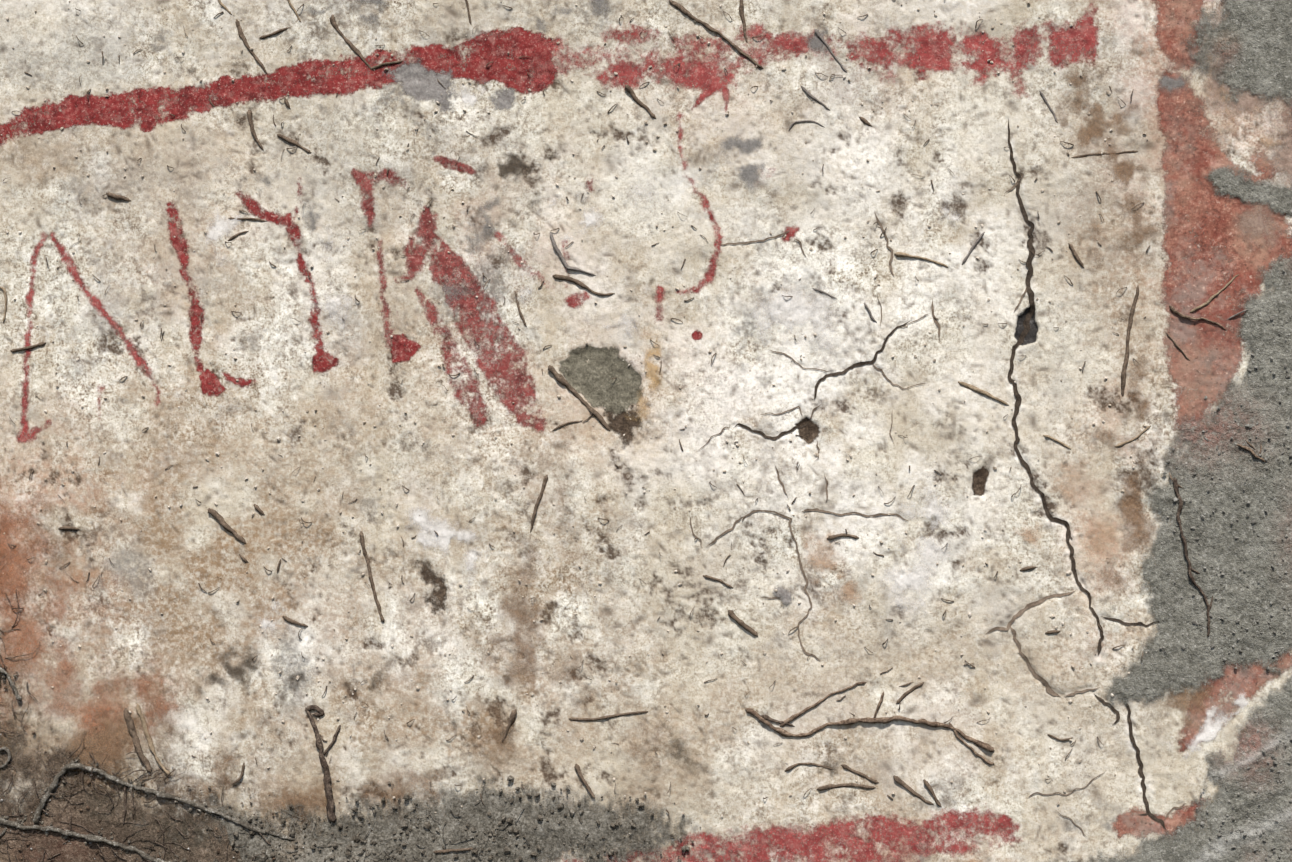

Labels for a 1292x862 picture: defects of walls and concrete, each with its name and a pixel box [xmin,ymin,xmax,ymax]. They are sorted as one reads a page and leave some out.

spalling [559,345,643,447]
crack [690,213,941,661]
crack [986,118,1186,836]